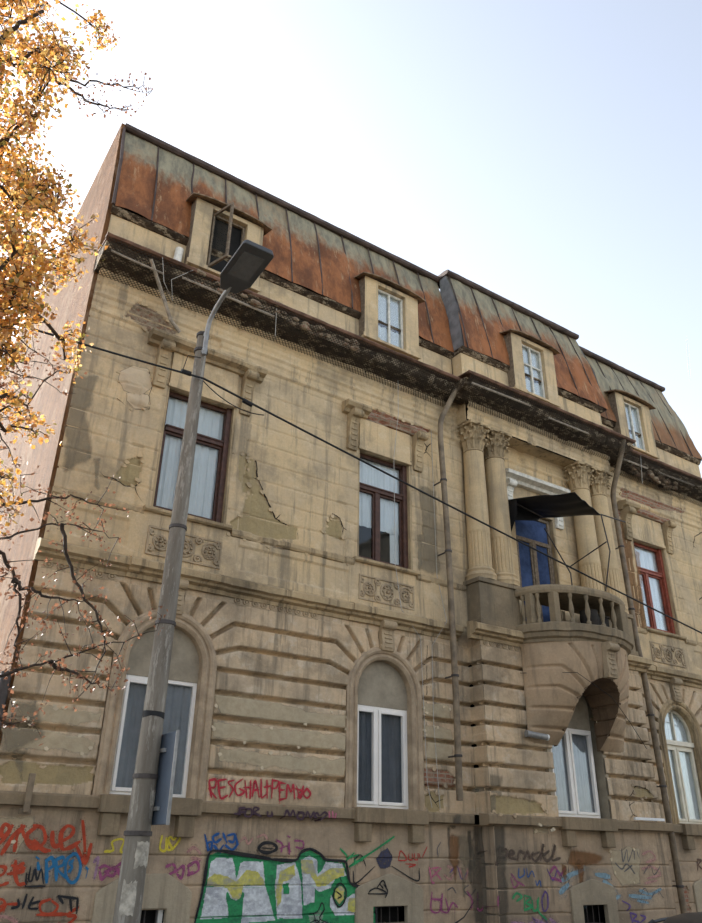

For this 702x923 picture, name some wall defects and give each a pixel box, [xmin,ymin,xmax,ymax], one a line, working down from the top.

flaking render [114,454,144,487]
flaking render [226,452,308,556]
flaking render [320,514,346,540]
peeling [422,703,456,813]